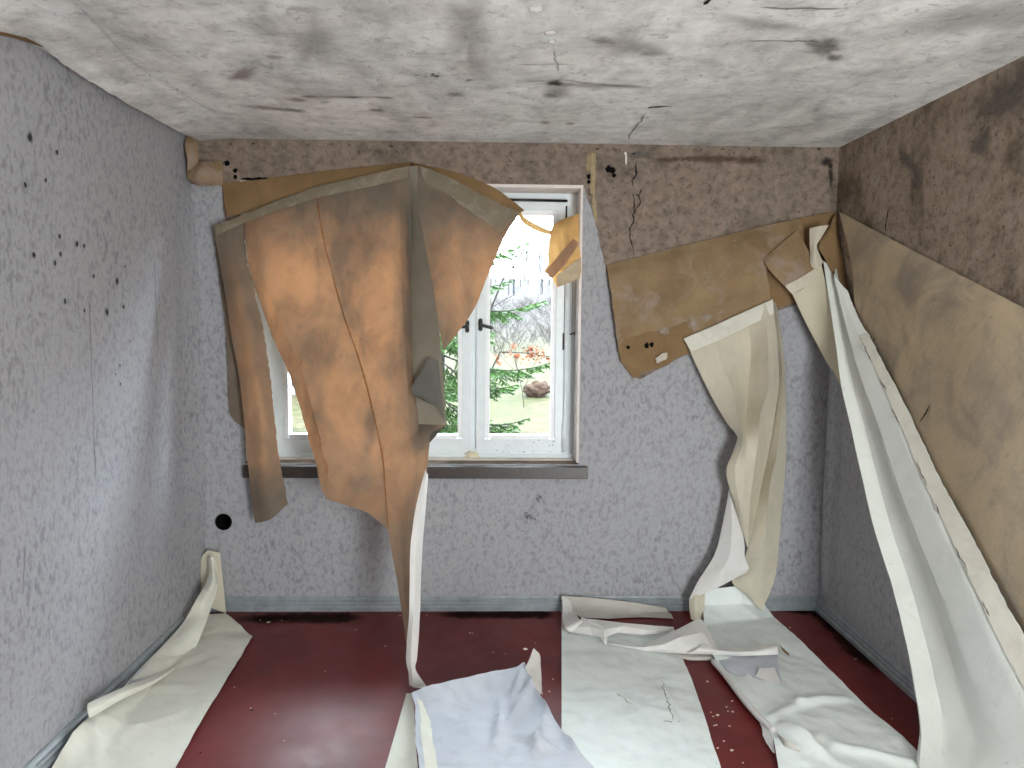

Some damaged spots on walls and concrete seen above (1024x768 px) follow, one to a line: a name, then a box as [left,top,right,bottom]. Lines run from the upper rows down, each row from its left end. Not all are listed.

leakage [811,41,838,60]
crack [628,106,672,139]
peeling [198,56,1024,316]
crack [629,164,642,253]
peeling [635,353,684,379]
spalling [215,514,232,530]